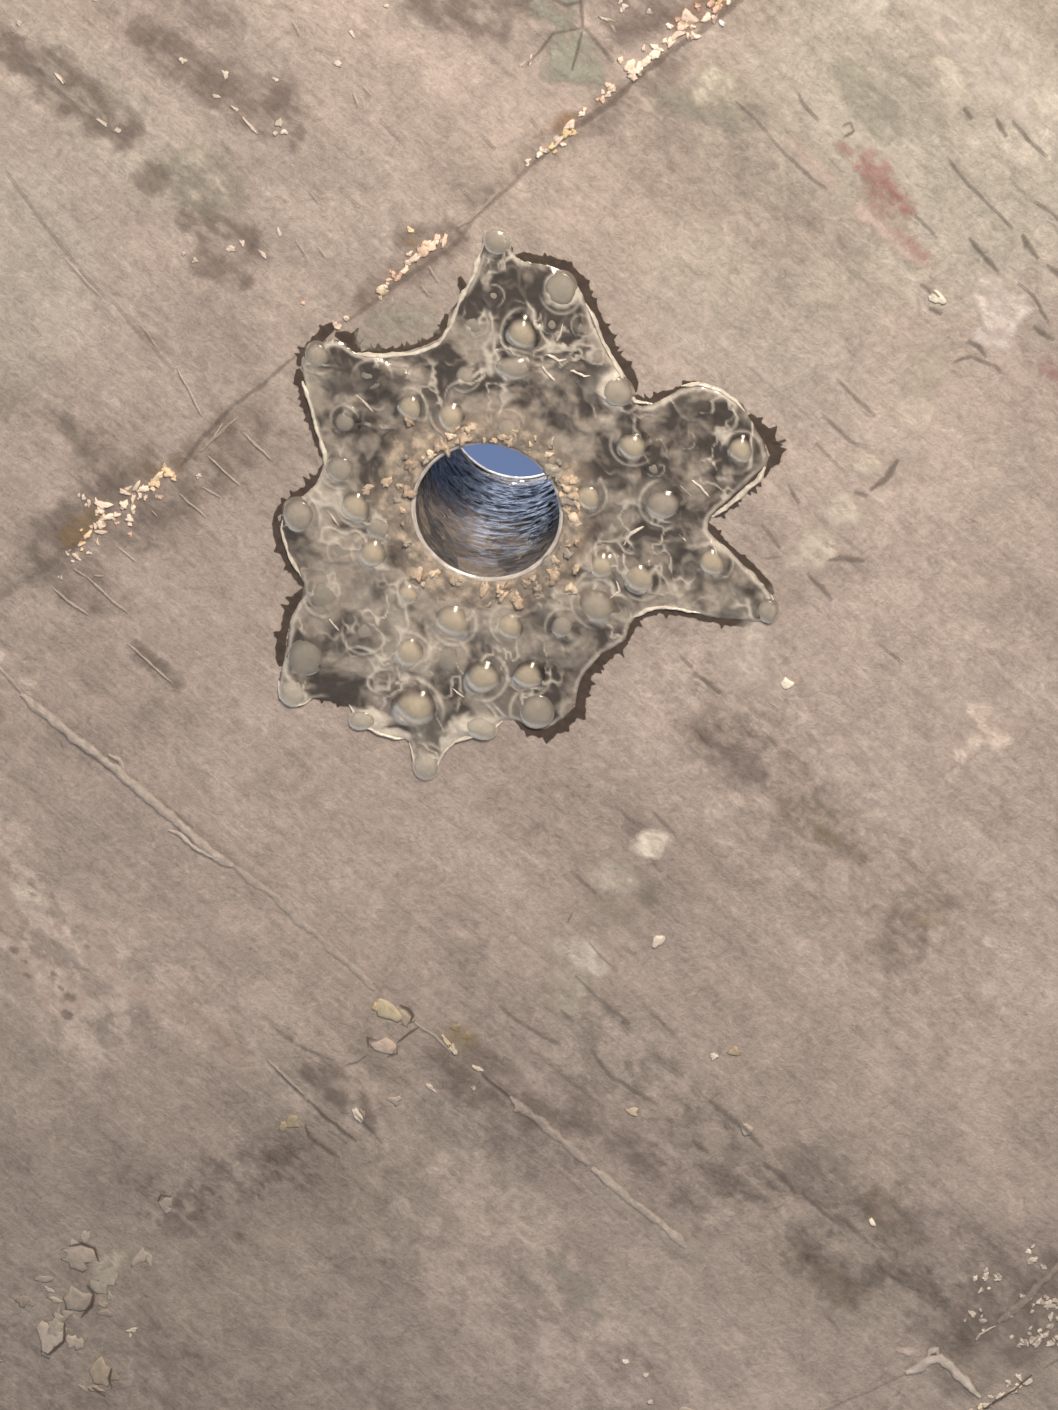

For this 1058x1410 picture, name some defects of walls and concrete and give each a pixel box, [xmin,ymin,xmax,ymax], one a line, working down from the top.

spalling [525,0,731,166]
spalling [376,226,448,300]
crack [818,416,899,496]
spalling [57,463,177,580]
leakage [272,226,787,781]
leakage [790,493,860,569]
leakage [636,832,668,858]
leakage [550,939,607,1009]
crack [347,1004,420,1065]
crack [268,1059,383,1158]
peeling [15,1230,153,1359]
crack [969,1365,1048,1410]